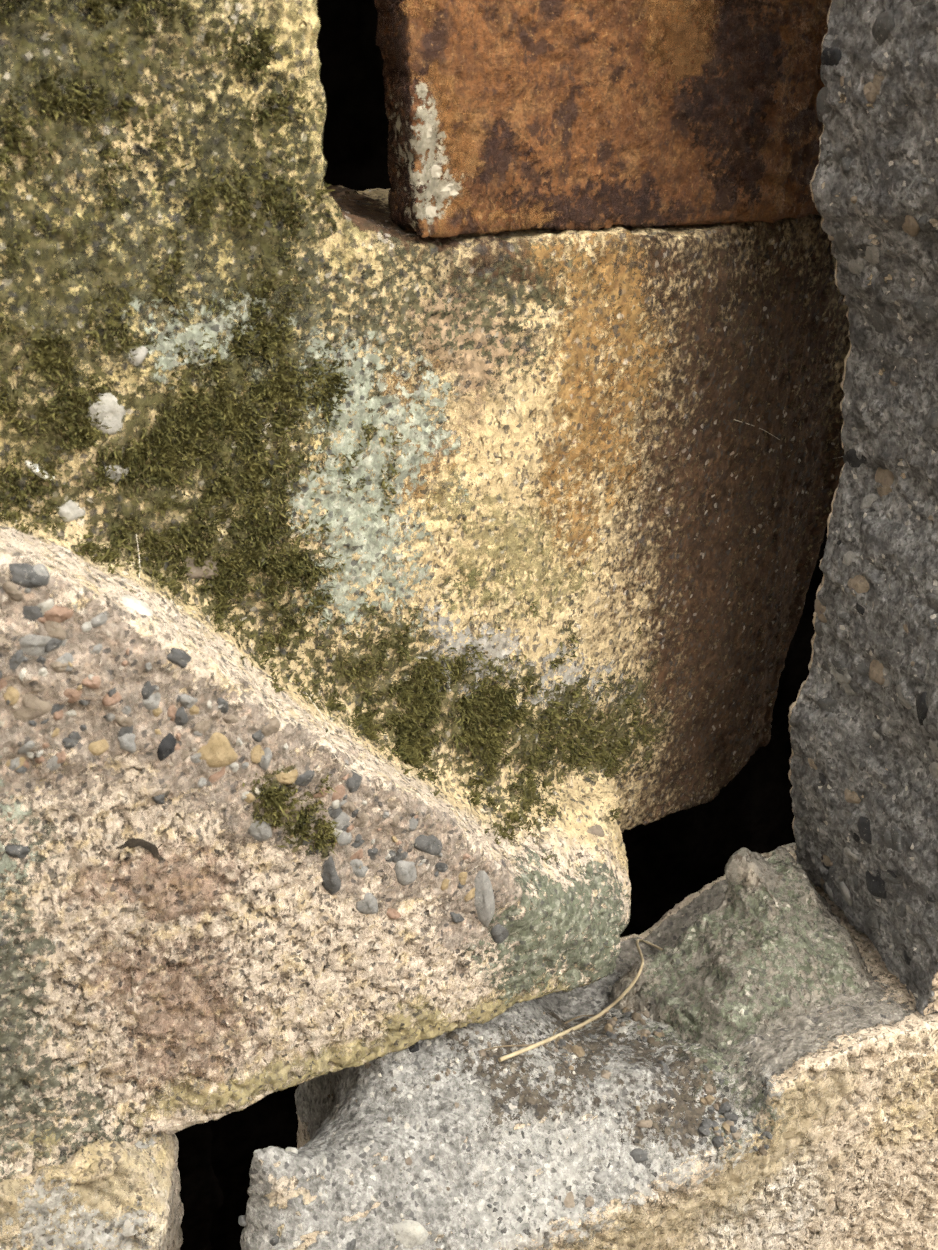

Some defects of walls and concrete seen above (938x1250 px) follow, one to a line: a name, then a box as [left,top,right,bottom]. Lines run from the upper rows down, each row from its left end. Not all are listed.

leakage [417,604,642,720]
rust [322,0,851,833]